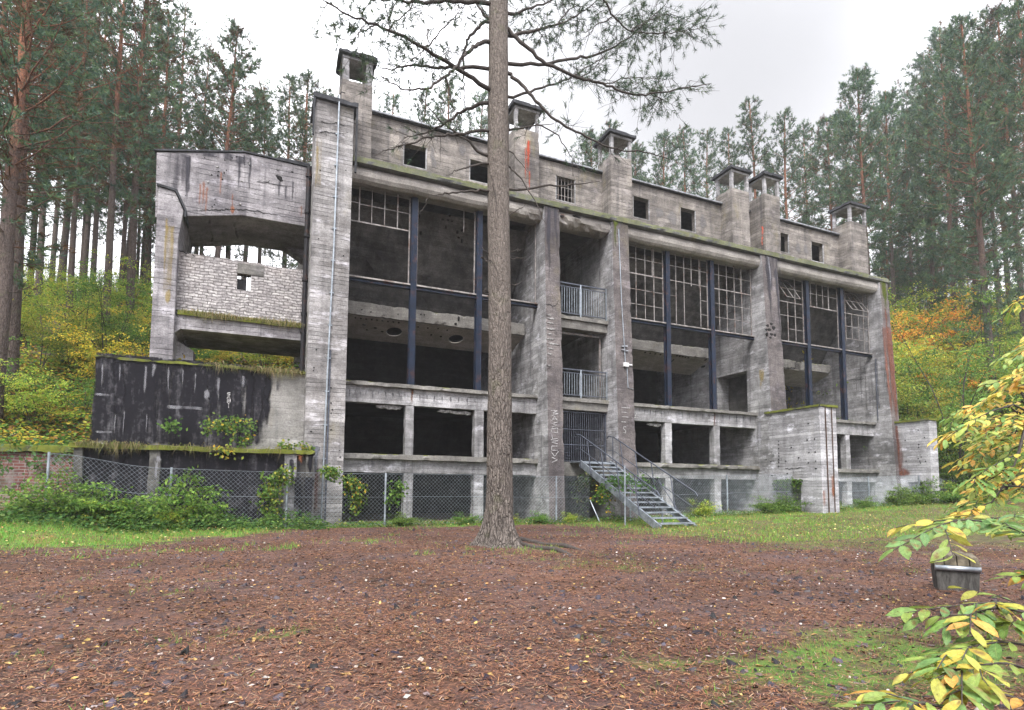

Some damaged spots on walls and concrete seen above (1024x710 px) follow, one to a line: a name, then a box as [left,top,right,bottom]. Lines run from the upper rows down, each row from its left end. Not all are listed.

damp [173,155,191,192]
damp [82,353,319,525]
rust [882,309,909,476]